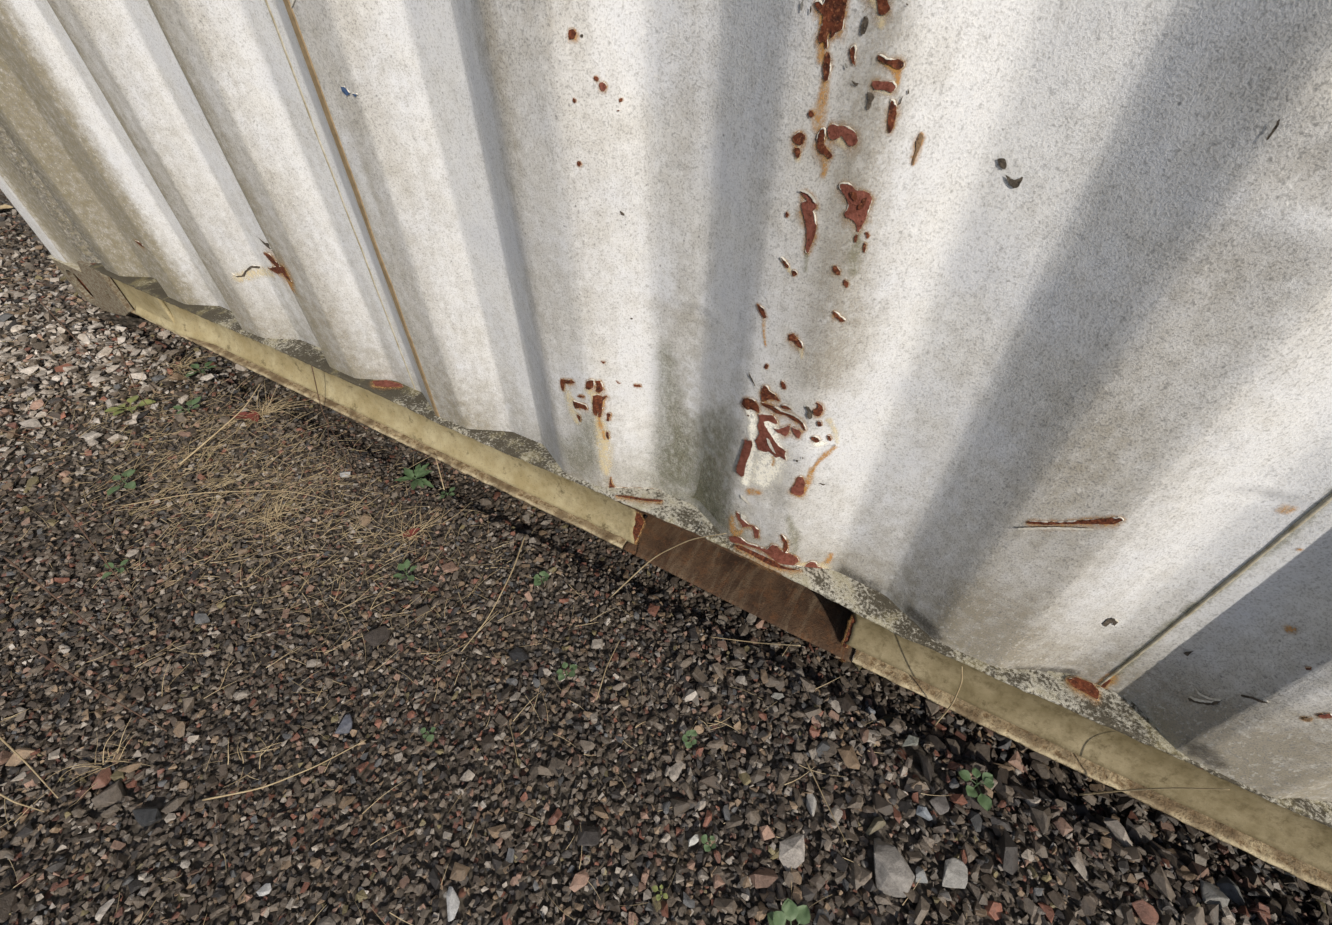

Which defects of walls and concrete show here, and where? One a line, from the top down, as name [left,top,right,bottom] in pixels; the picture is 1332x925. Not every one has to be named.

peeling [792,0,909,176]
peeling [912,132,924,165]
peeling [785,190,818,255]
peeling [838,182,874,253]
peeling [260,239,293,291]
peeling [832,265,850,288]
peeling [788,333,804,358]
peeling [736,380,837,497]
corrosion [1066,676,1116,702]
peeling [1188,687,1221,705]